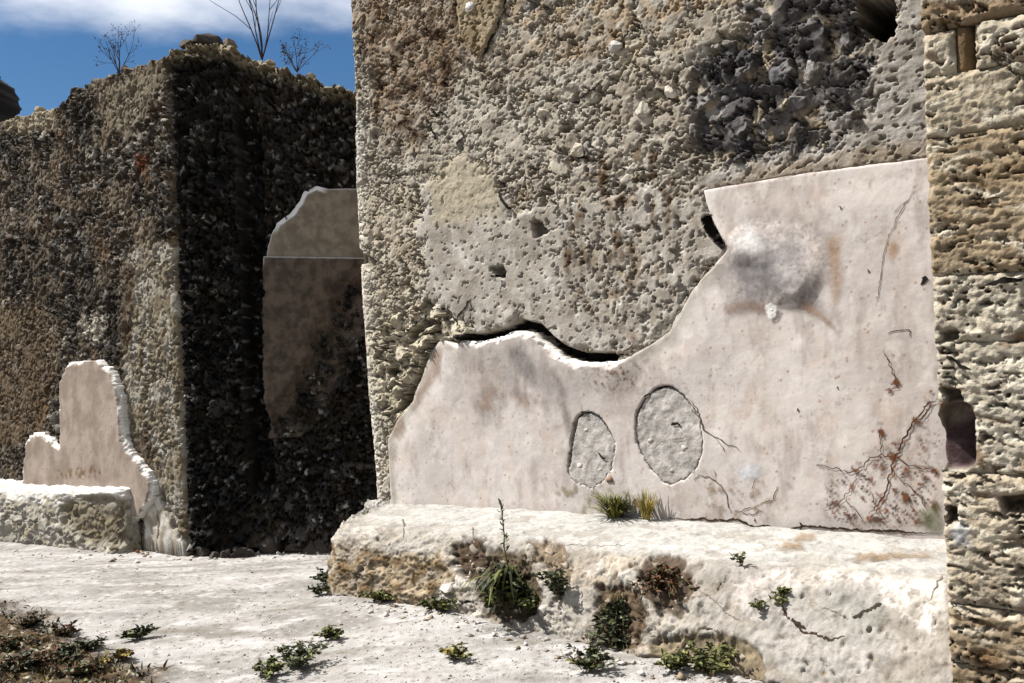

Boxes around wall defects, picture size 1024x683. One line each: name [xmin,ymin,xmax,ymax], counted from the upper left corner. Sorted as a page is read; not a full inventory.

leakage [738,232,760,251]
crack [877,191,913,299]
crack [401,299,632,363]
spalling [568,411,616,488]
spalling [635,385,703,484]
crack [692,402,740,451]
crack [768,587,882,641]